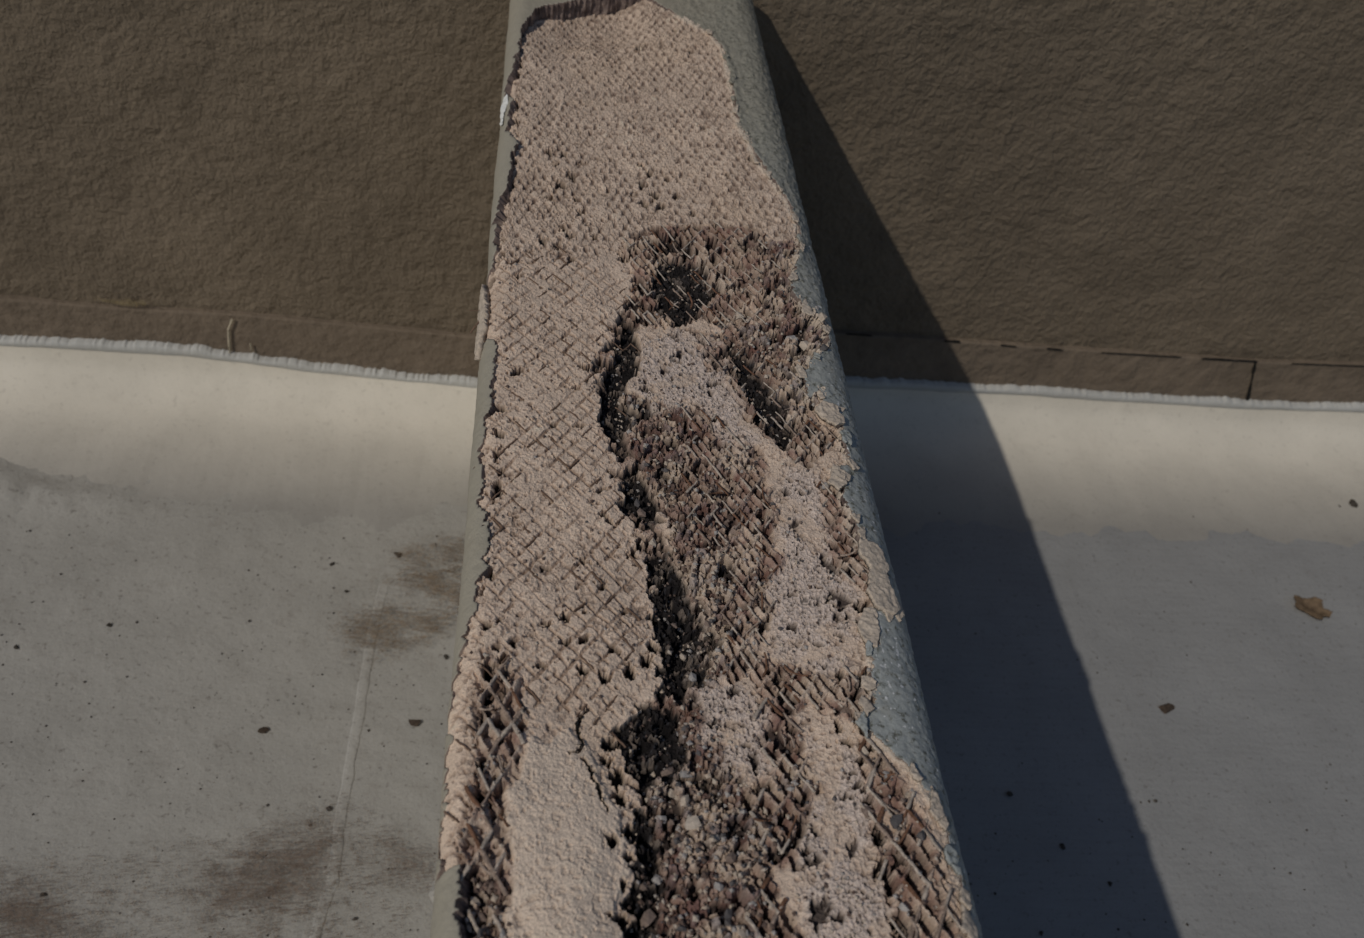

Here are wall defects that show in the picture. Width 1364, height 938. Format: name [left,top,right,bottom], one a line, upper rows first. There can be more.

spalling [440,0,979,938]